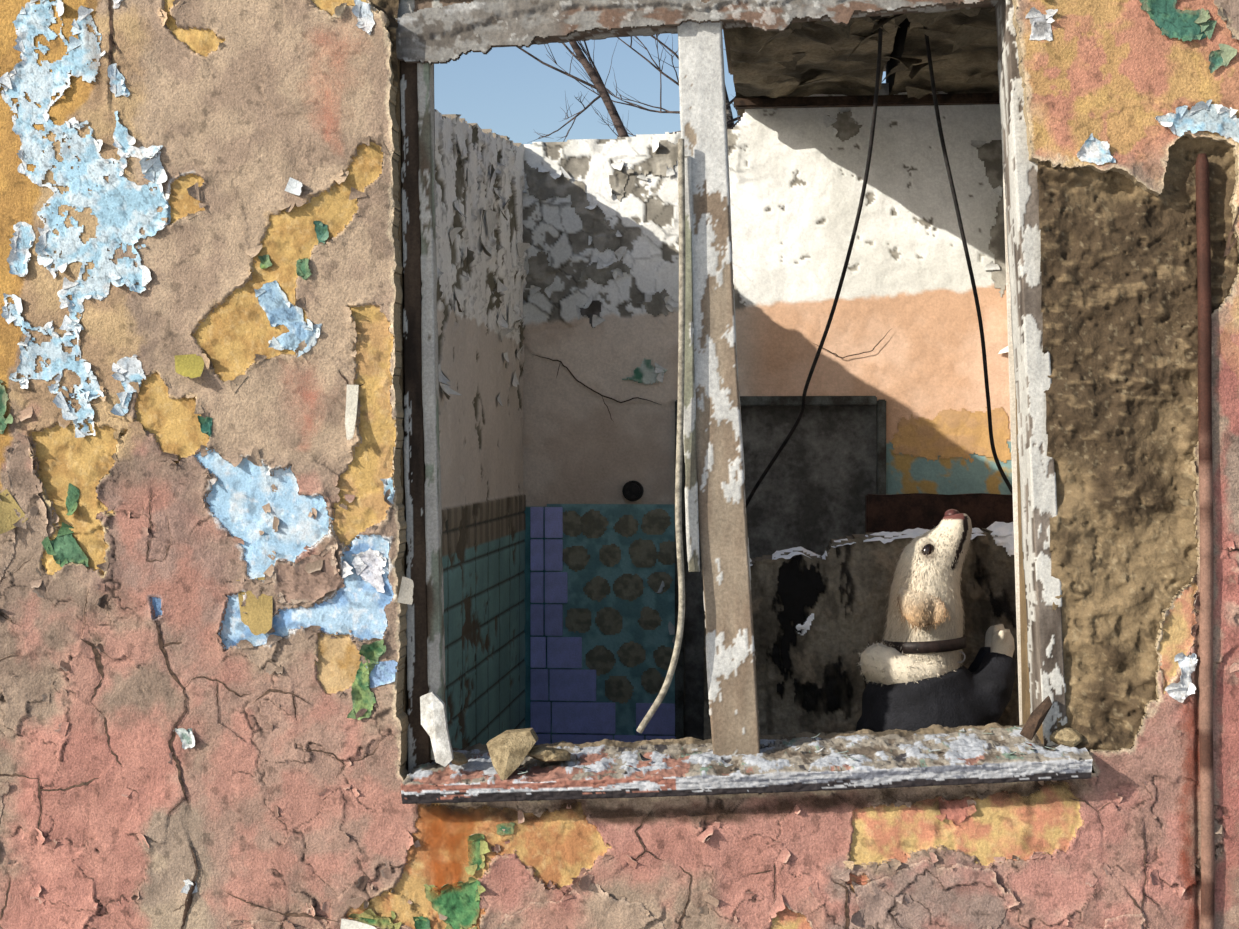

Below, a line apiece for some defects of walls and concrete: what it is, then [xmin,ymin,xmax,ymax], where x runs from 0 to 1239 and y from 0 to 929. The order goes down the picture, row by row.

peeling [1025,7,1058,41]
peeling [1139,0,1239,73]
peeling [449,134,679,328]
peeling [0,0,414,720]
spalling [1037,100,1239,751]
crack [0,589,122,837]
crack [155,621,381,821]
crack [174,846,198,929]
crack [229,894,337,929]
peeling [291,803,637,929]
crack [621,808,692,929]
crack [817,878,873,929]